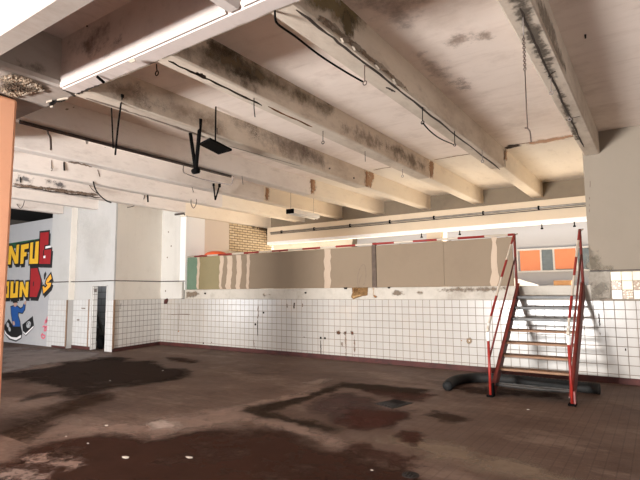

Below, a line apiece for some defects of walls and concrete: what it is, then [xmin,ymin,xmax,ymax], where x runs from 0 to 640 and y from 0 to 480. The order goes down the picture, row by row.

leakage [510,0,566,78]
spalling [0,74,45,98]
leakage [203,41,285,90]
leakage [292,89,332,111]
crack [505,8,584,149]
leakage [278,140,322,163]
spalling [343,287,368,299]
leakage [1,357,197,442]
leakage [307,389,434,430]